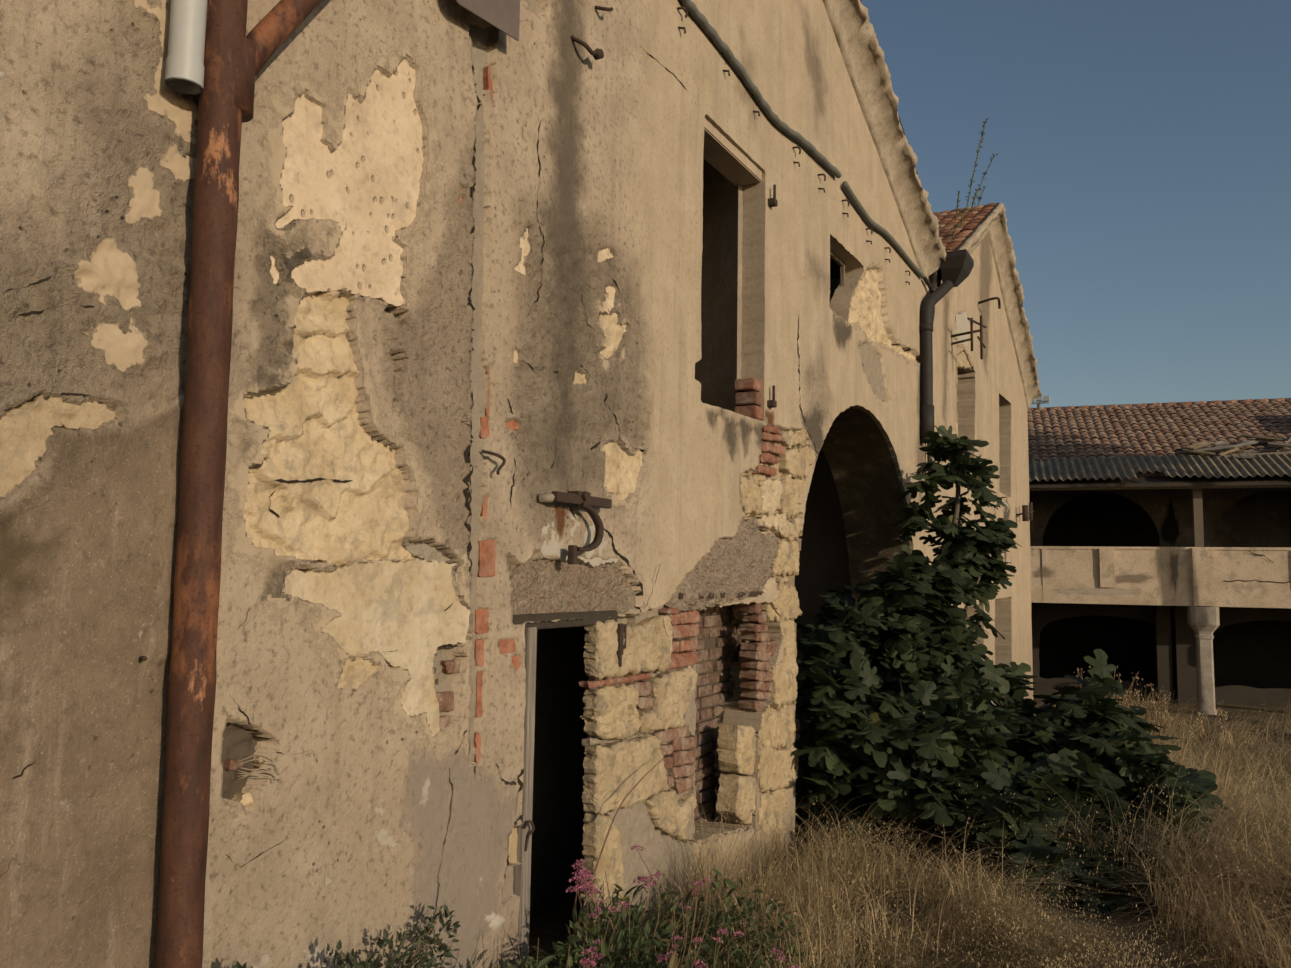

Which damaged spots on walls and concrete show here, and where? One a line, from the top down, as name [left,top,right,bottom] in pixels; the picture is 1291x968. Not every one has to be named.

peeling [125,0,199,235]
damp [550,0,583,324]
peeling [0,395,115,497]
peeling [74,238,148,372]
spalling [227,41,472,754]
peeling [514,229,530,275]
peeling [597,248,613,262]
peeling [598,286,626,359]
peeling [604,442,643,500]
spalling [848,269,916,404]
spalling [221,723,281,807]
crack [431,730,524,924]